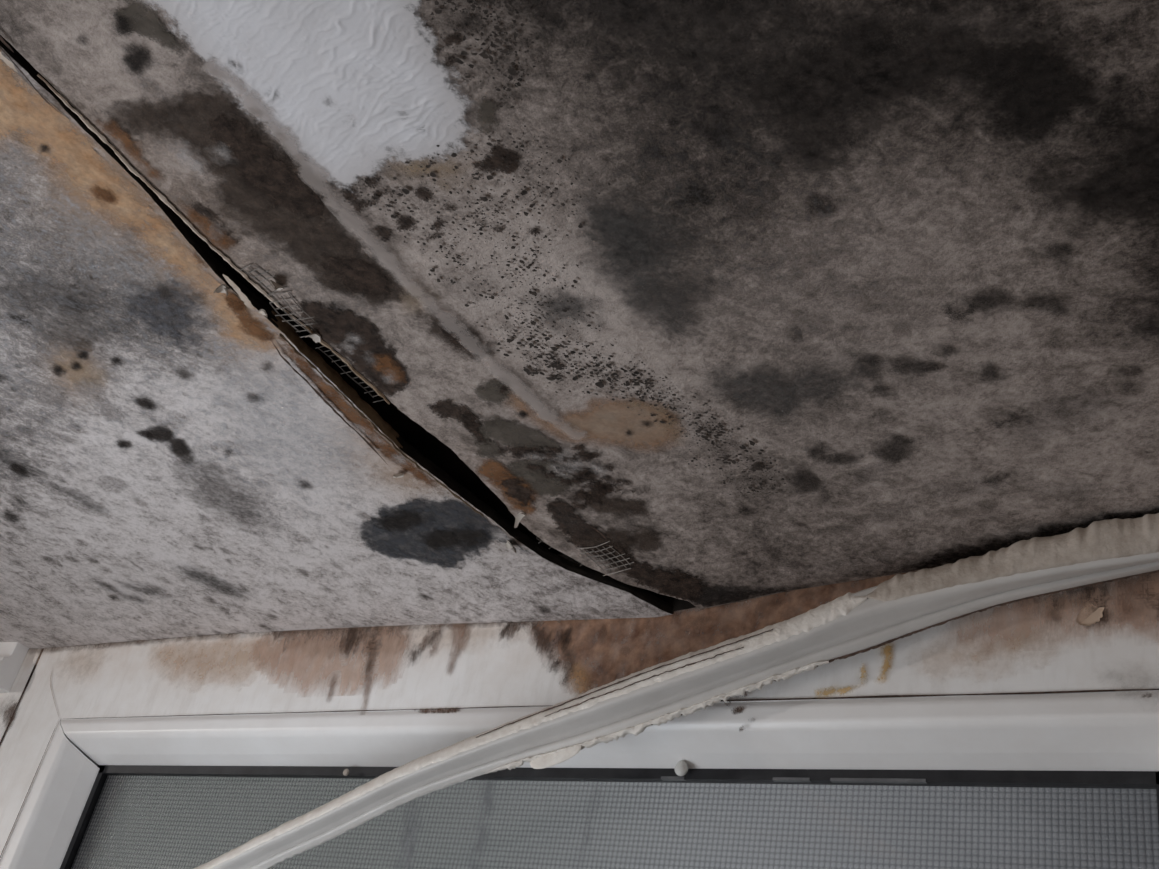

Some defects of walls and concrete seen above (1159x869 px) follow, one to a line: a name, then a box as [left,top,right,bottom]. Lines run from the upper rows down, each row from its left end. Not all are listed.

water stain [0,59,272,349]
crack [0,35,696,614]
water stain [108,0,819,607]
water stain [947,289,1065,320]
water stain [53,341,93,383]
water stain [0,453,29,477]
water stain [875,436,913,463]
water stain [893,509,1159,573]
water stain [45,633,237,651]
water stain [168,622,524,703]
water stain [958,572,1159,641]
peeling [1076,602,1105,626]